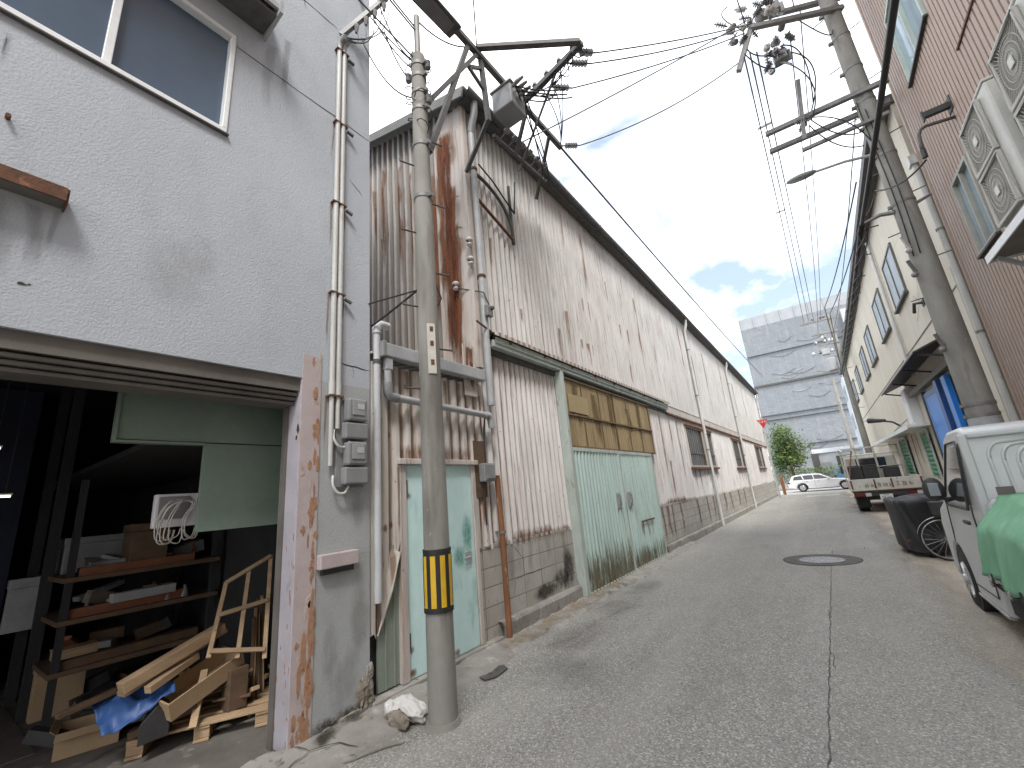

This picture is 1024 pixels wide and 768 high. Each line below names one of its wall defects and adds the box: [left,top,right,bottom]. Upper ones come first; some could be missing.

corrosion [371,164,413,256]
corrosion [431,135,472,367]
peeling [274,418,375,750]
leakage [510,503,685,642]
crack [827,548,877,768]